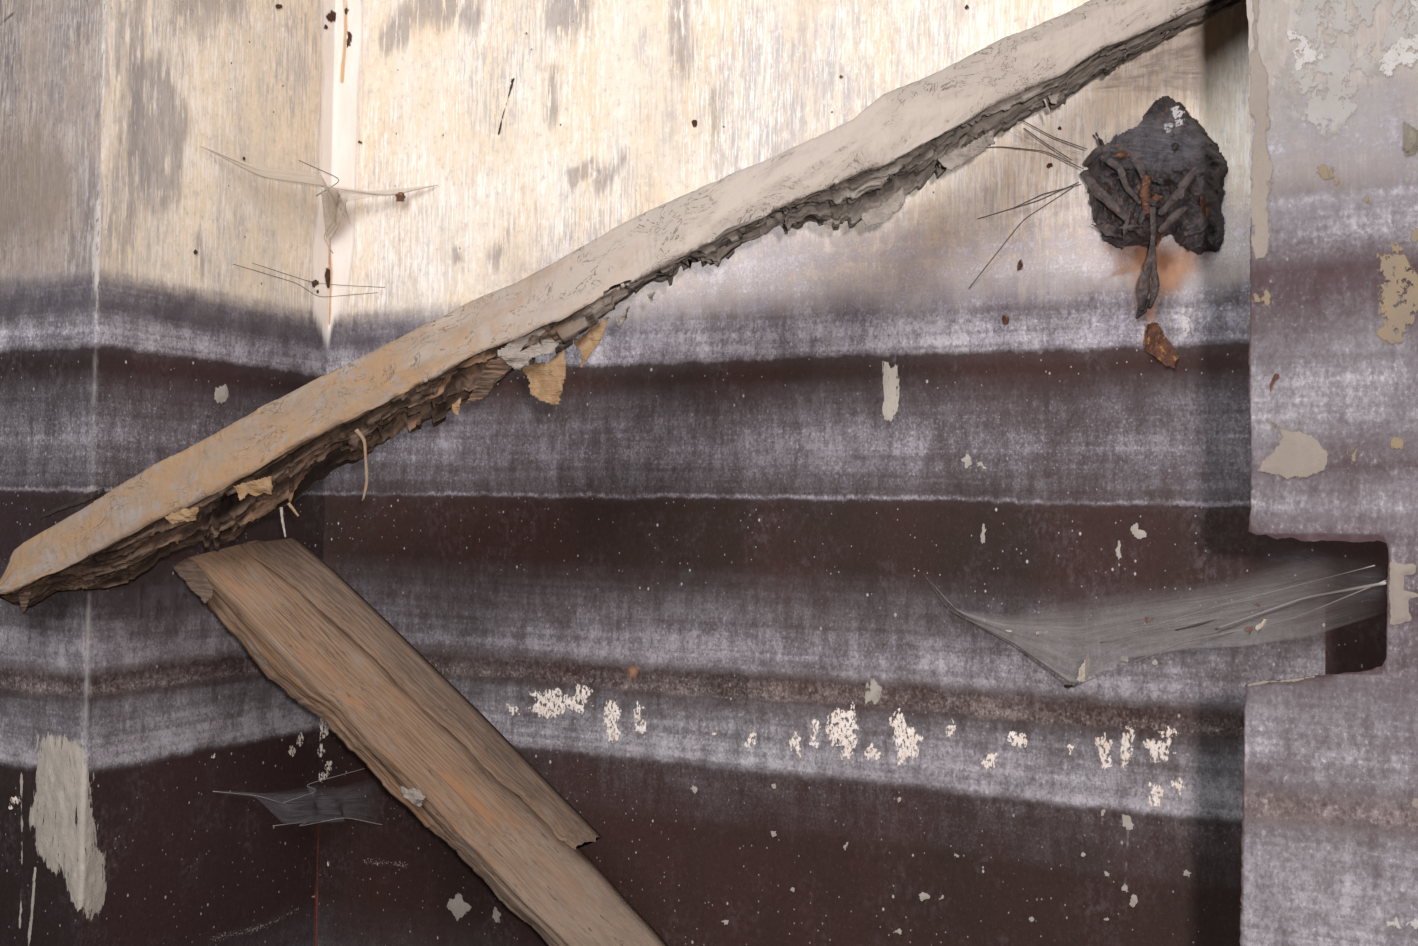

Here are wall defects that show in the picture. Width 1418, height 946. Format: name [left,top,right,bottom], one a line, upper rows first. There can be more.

peeling [1276,0,1418,136]
corrosion [1094,197,1191,290]
peeling [1376,228,1418,345]
corrosion [1143,308,1179,368]
water stain [0,402,225,492]
water stain [366,84,1418,946]
water stain [0,609,328,768]
peeling [506,684,646,744]
peeling [787,702,923,766]
peeling [981,731,1027,771]
peeling [1094,726,1179,770]
peeling [1149,778,1184,807]